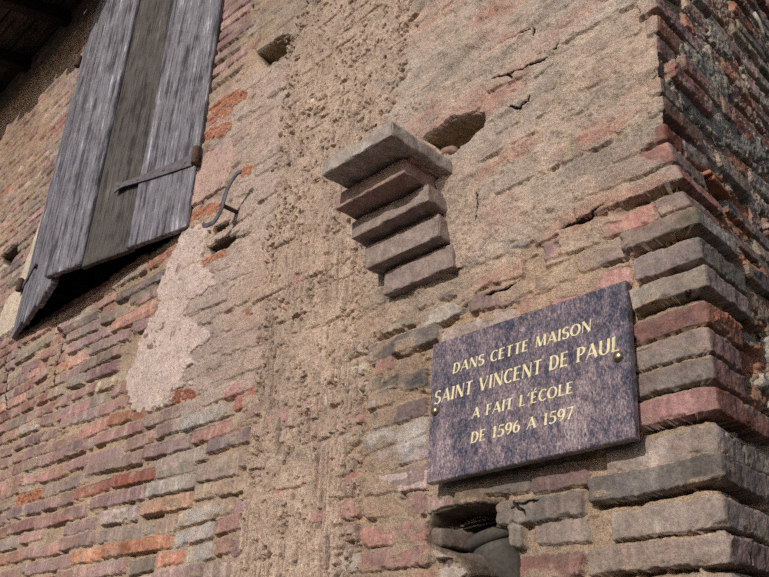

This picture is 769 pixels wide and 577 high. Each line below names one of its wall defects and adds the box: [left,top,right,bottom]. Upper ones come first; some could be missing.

crack [492,43,558,79]
crack [508,95,530,110]
crack [559,199,609,230]
spalling [171,388,197,404]